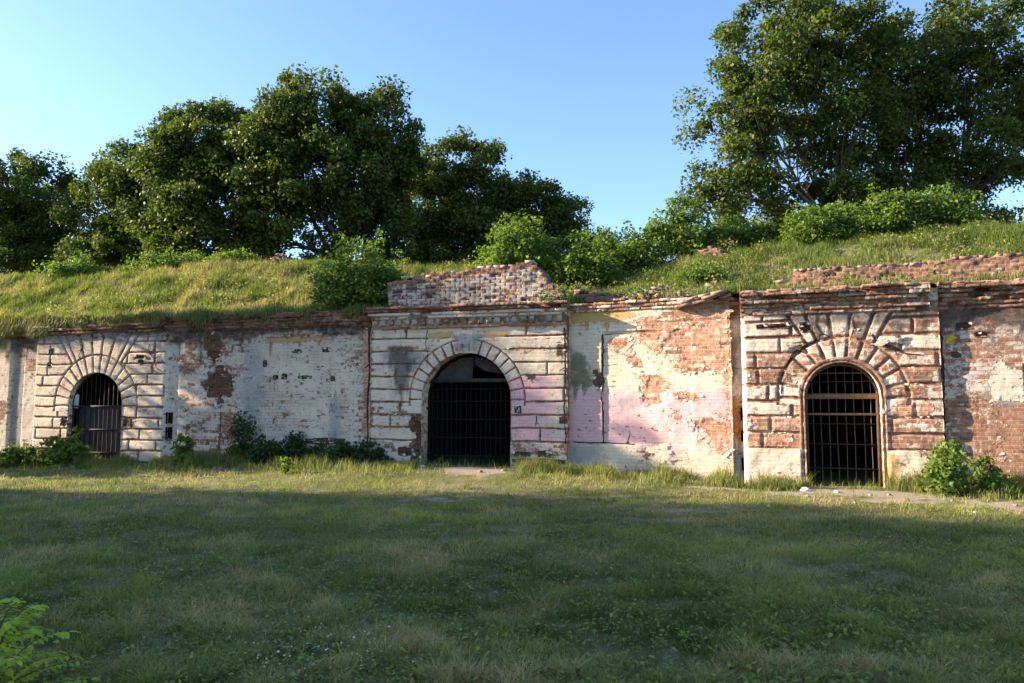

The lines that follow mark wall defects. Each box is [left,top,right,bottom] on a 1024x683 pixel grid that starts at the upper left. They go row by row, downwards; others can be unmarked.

peeling [178,331,242,450]
peeling [604,309,804,464]
peeling [879,367,1013,475]
spalling [955,322,989,338]